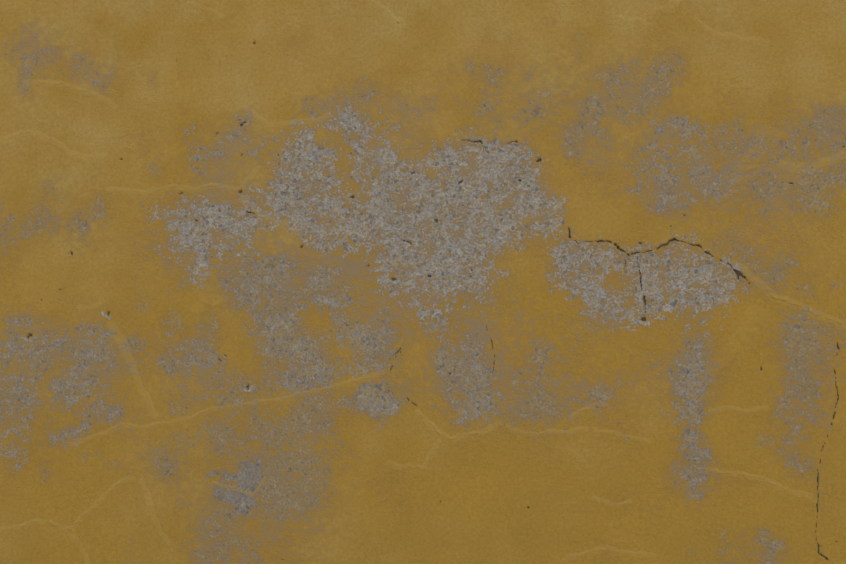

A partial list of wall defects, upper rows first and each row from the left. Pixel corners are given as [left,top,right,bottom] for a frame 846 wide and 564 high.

peeling [131,64,768,382]
crack [568,228,750,313]
peeling [0,356,44,476]
crack [815,343,839,560]